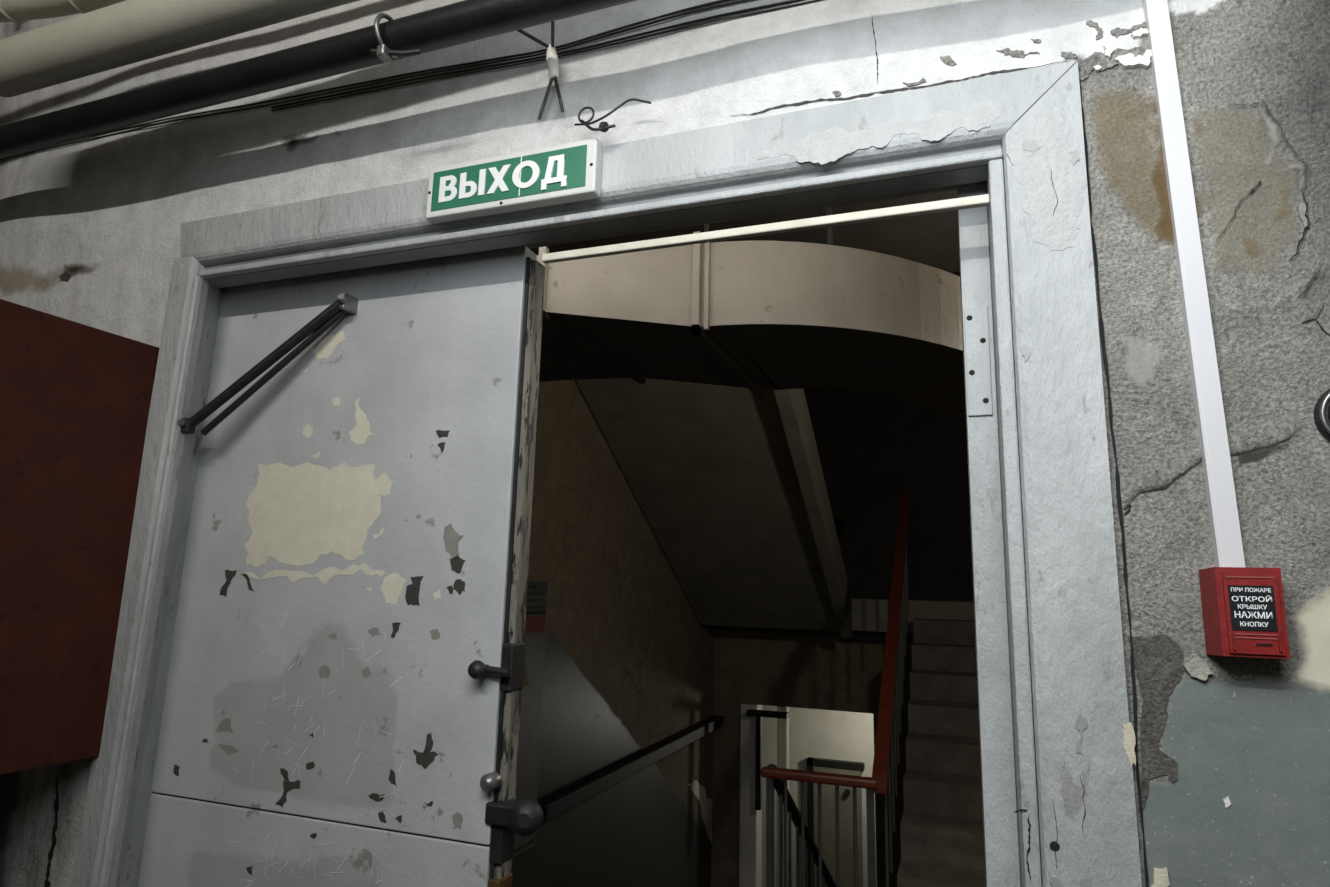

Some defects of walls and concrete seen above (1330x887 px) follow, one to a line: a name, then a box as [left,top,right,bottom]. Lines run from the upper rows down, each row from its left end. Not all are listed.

peeling [940,55,957,66]
peeling [996,39,1041,58]
peeling [1061,20,1152,82]
damp [1154,132,1174,238]
crack [1216,180,1261,242]
crack [1229,102,1330,336]
peeling [1123,634,1213,811]
peeling [1151,867,1170,887]